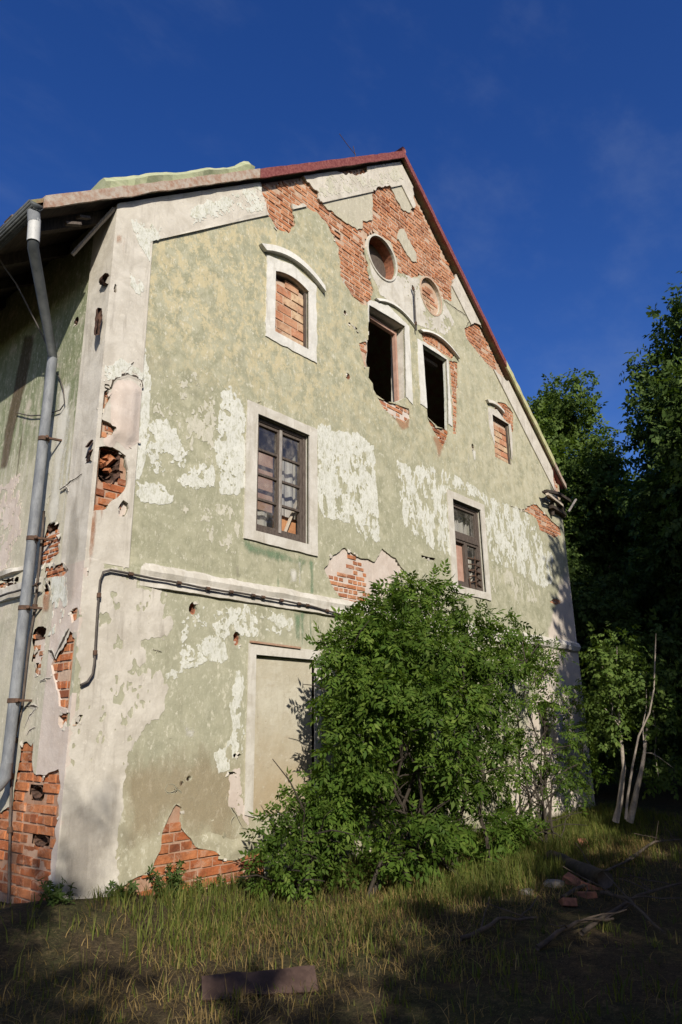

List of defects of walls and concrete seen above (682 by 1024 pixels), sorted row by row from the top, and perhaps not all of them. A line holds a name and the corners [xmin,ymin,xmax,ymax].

flaking render [190,167,505,446]